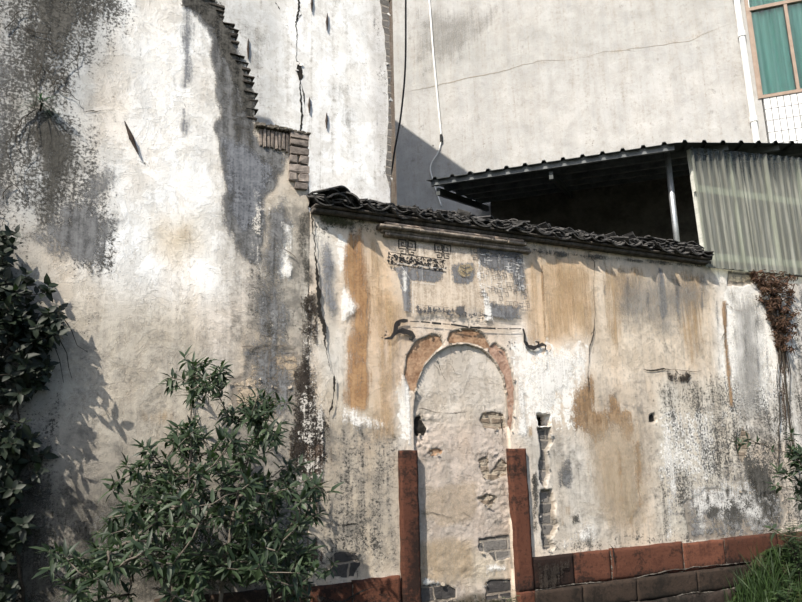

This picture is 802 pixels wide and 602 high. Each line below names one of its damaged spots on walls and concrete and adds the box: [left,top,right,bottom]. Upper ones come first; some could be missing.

water stain [20,0,111,95]
crack [276,0,301,61]
crack [298,80,306,131]
water stain [26,102,122,274]
water stain [181,0,355,488]
crack [277,213,336,415]
water stain [669,372,691,384]
spalling [536,415,559,552]
water stain [689,426,780,532]
spalling [328,552,360,578]
spalling [478,535,510,561]
spalling [485,579,511,600]